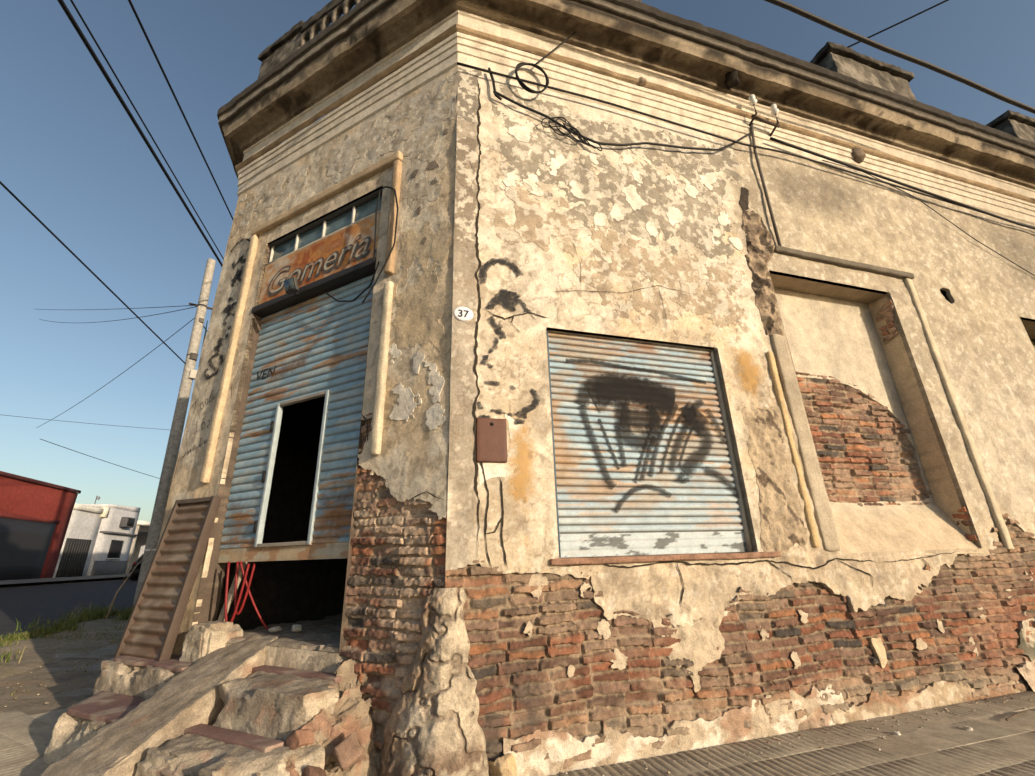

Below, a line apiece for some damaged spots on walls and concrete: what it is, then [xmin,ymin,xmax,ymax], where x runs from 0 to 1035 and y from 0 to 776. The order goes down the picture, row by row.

peeling [325,67,786,431]
flaking render [340,406,1035,776]
flaking render [796,372,933,507]